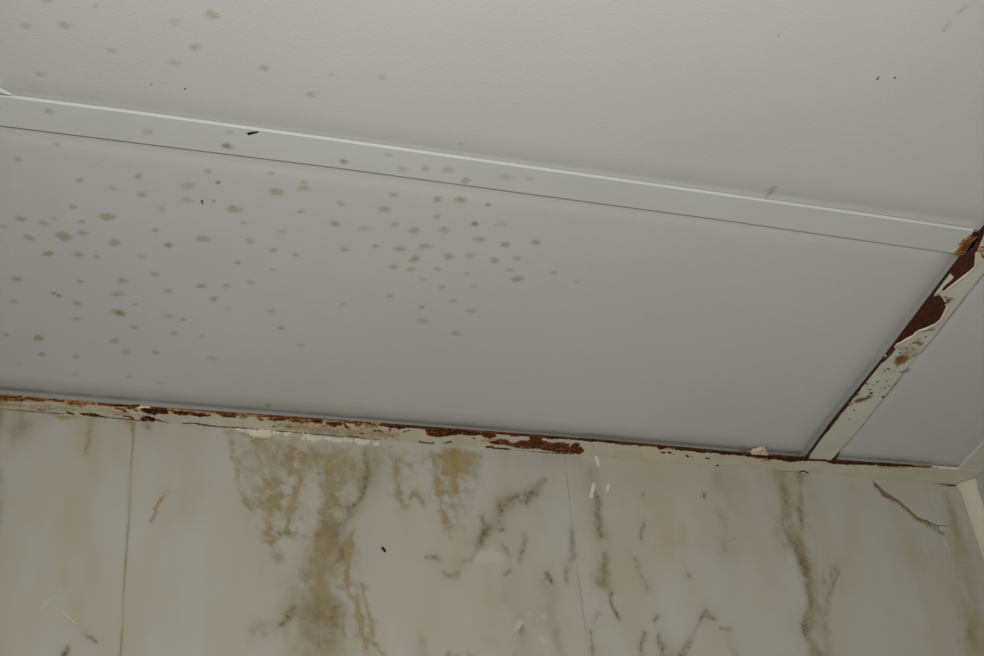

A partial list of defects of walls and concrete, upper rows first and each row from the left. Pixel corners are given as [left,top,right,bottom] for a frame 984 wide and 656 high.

rust [954,234,977,256]
peeling [882,225,984,362]
rust [0,329,932,473]
leakage [268,449,354,533]
leakage [435,449,476,495]
crack [873,481,946,534]